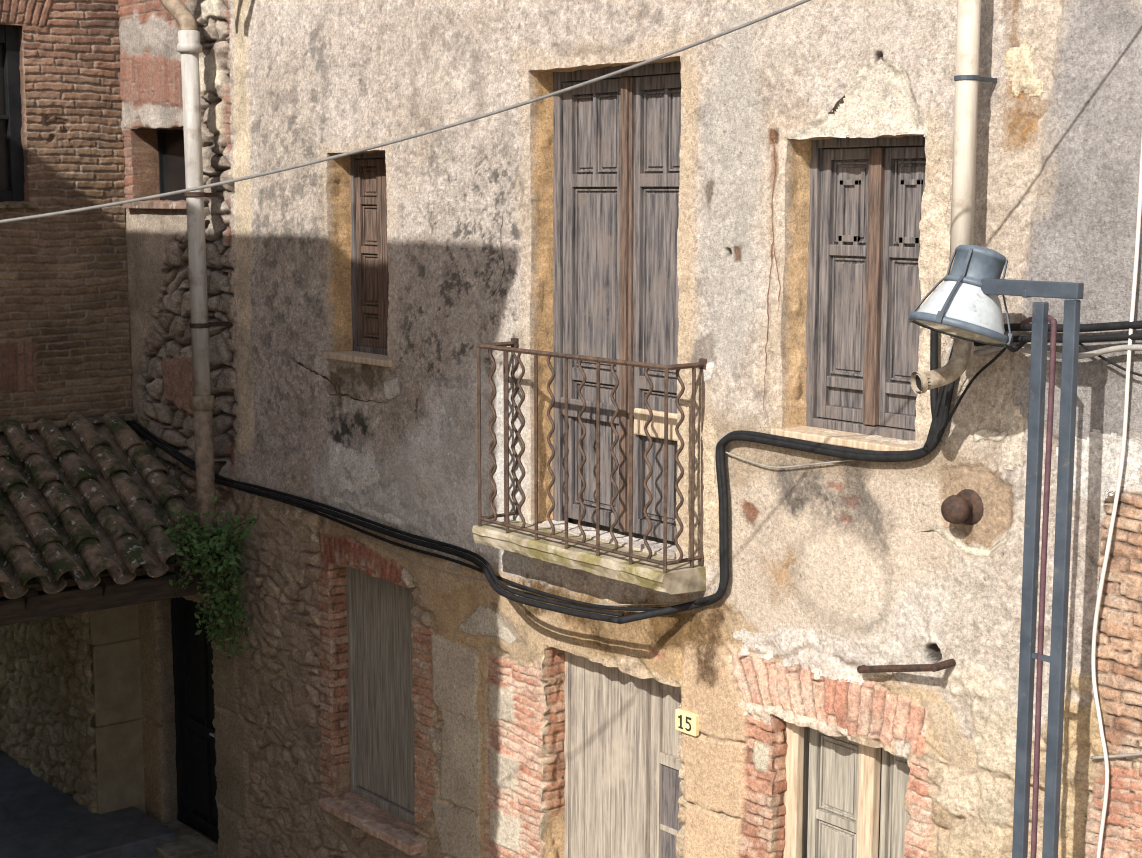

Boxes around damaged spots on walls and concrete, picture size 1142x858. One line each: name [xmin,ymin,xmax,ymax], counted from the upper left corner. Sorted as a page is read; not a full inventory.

flaking render [1003,41,1043,96]
flaking render [918,170,951,308]
flaking render [918,326,945,372]
crack [292,359,402,403]
flaking render [912,390,932,448]